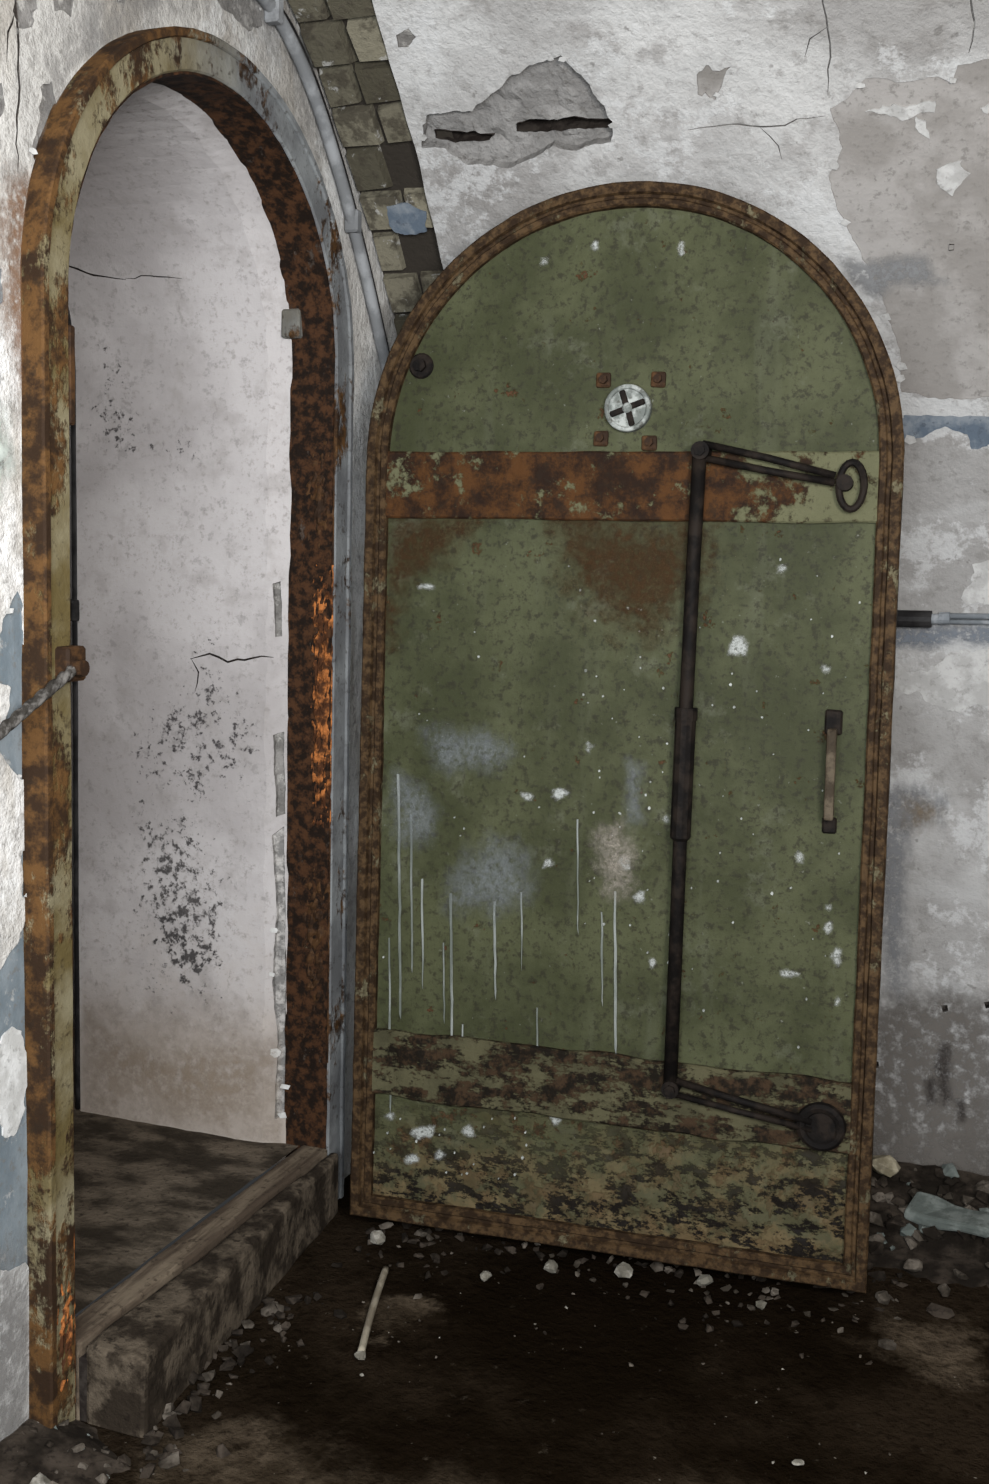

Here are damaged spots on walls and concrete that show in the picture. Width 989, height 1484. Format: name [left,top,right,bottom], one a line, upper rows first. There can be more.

crack [7,0,21,172]
flaking render [14,0,73,34]
flaking render [417,56,620,168]
crack [690,0,831,159]
crack [968,0,976,51]
flaking render [829,59,989,449]
leakage [129,639,261,1001]
crack [191,653,274,691]
rust [302,430,335,1063]
peeling [0,929,28,1271]
rust [57,1236,76,1403]